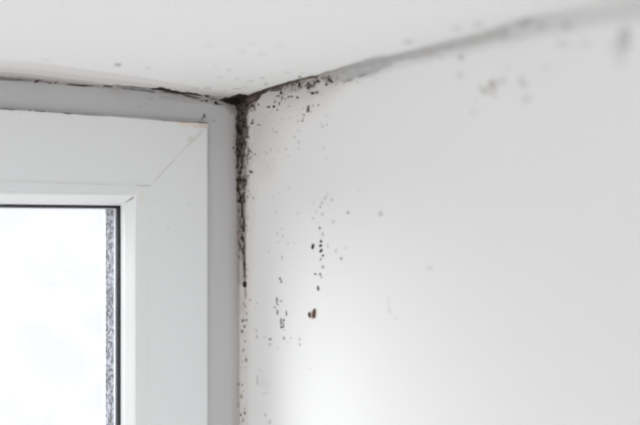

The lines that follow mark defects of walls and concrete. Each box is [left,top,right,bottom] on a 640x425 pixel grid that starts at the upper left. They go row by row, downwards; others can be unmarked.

mould [311,192,348,278]
mould [274,297,301,346]